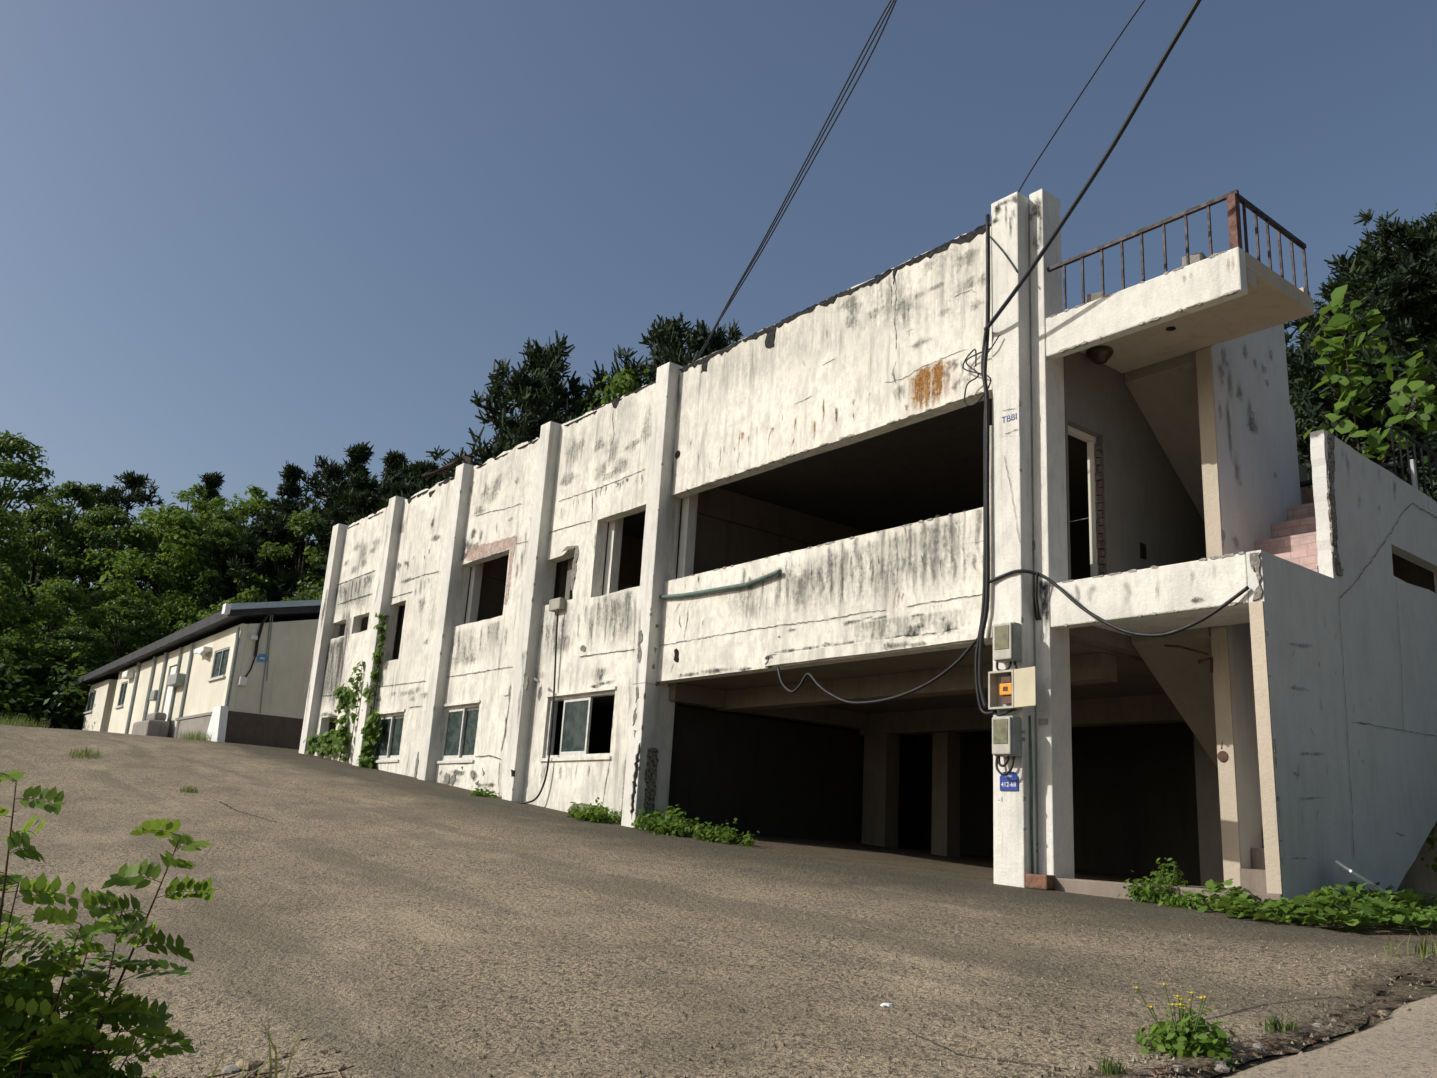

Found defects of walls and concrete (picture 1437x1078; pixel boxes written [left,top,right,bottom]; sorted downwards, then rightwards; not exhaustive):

water stain [843,297,878,325]
corrosion [905,360,943,410]
water stain [569,426,649,507]
water stain [743,509,983,609]